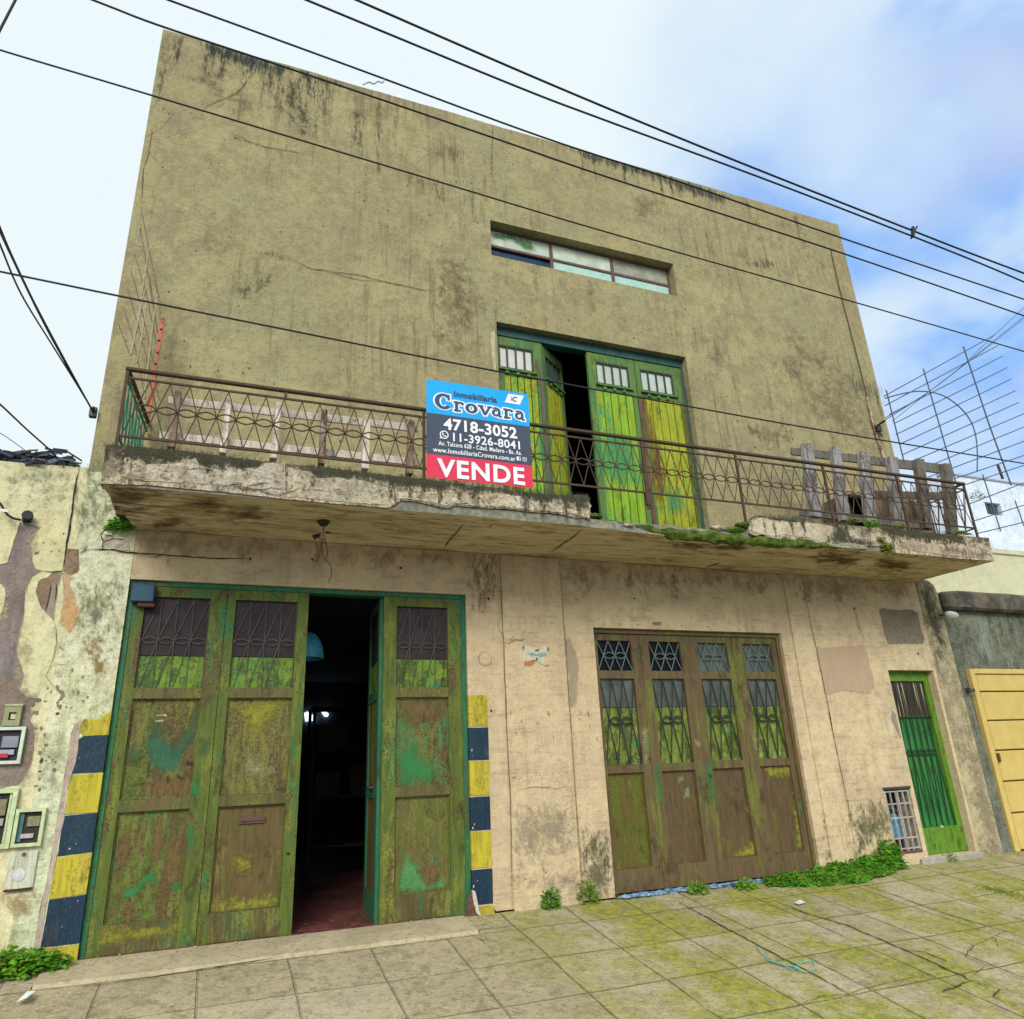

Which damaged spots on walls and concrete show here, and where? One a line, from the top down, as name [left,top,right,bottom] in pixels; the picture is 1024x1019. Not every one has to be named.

damp [201,43,337,134]
damp [580,151,725,201]
crack [290,259,443,292]
peeling [121,458,587,516]
crack [46,467,252,580]
crack [630,560,762,574]
damp [808,526,876,569]
damp [875,559,914,572]
flaking render [0,522,89,950]